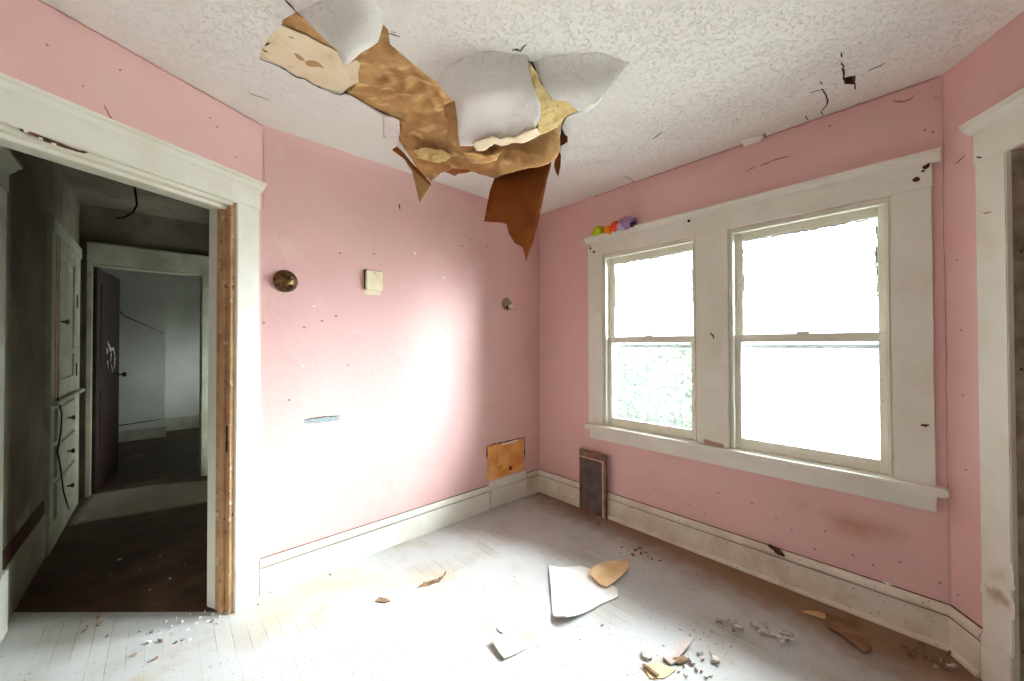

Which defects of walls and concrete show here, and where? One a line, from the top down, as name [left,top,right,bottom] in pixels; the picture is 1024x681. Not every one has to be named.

peeling [260,25,361,95]
crack [594,53,944,197]
crack [942,207,950,595]